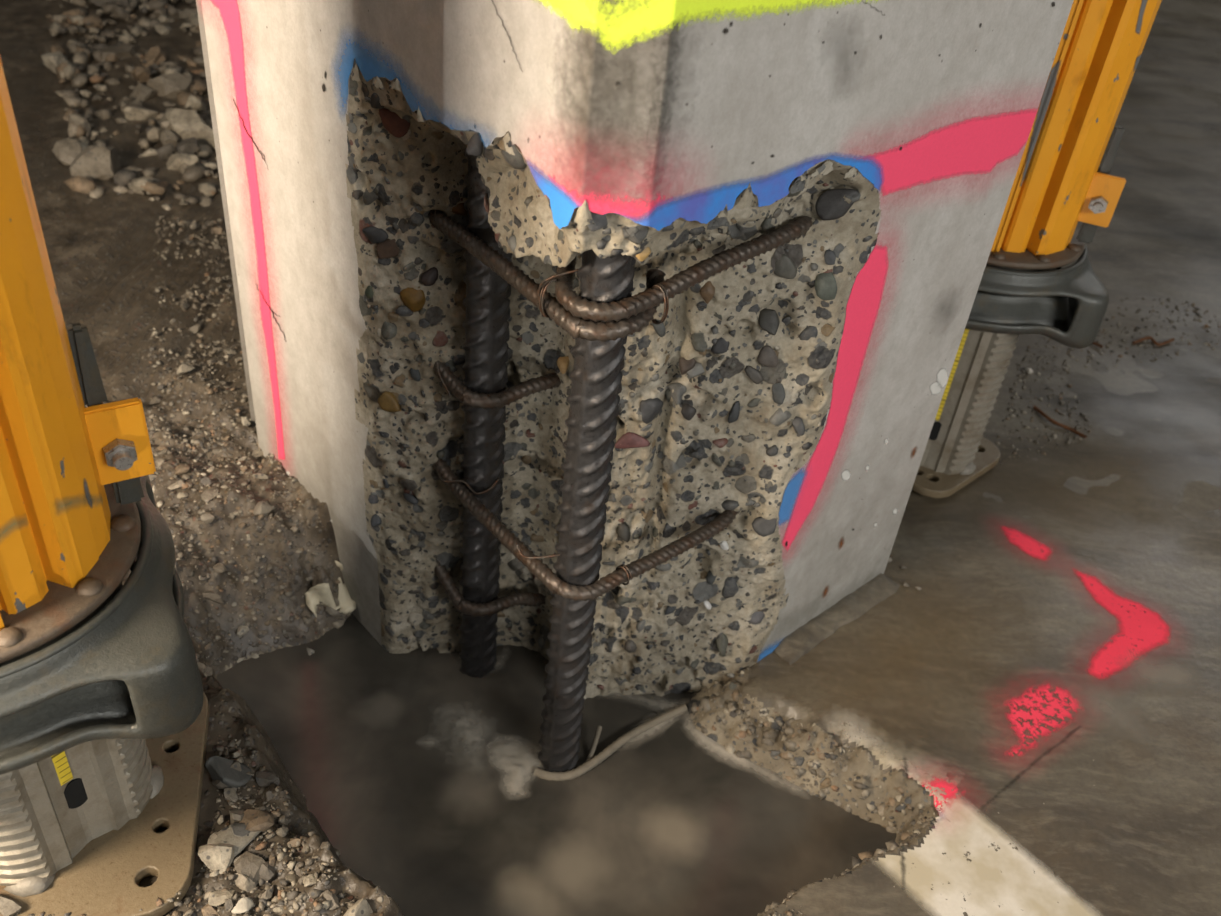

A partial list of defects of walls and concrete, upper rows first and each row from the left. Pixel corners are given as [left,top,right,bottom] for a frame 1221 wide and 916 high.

crack [233,99,265,161]
crack [260,291,286,341]
spalling [345,59,936,916]
spalling [214,613,351,679]